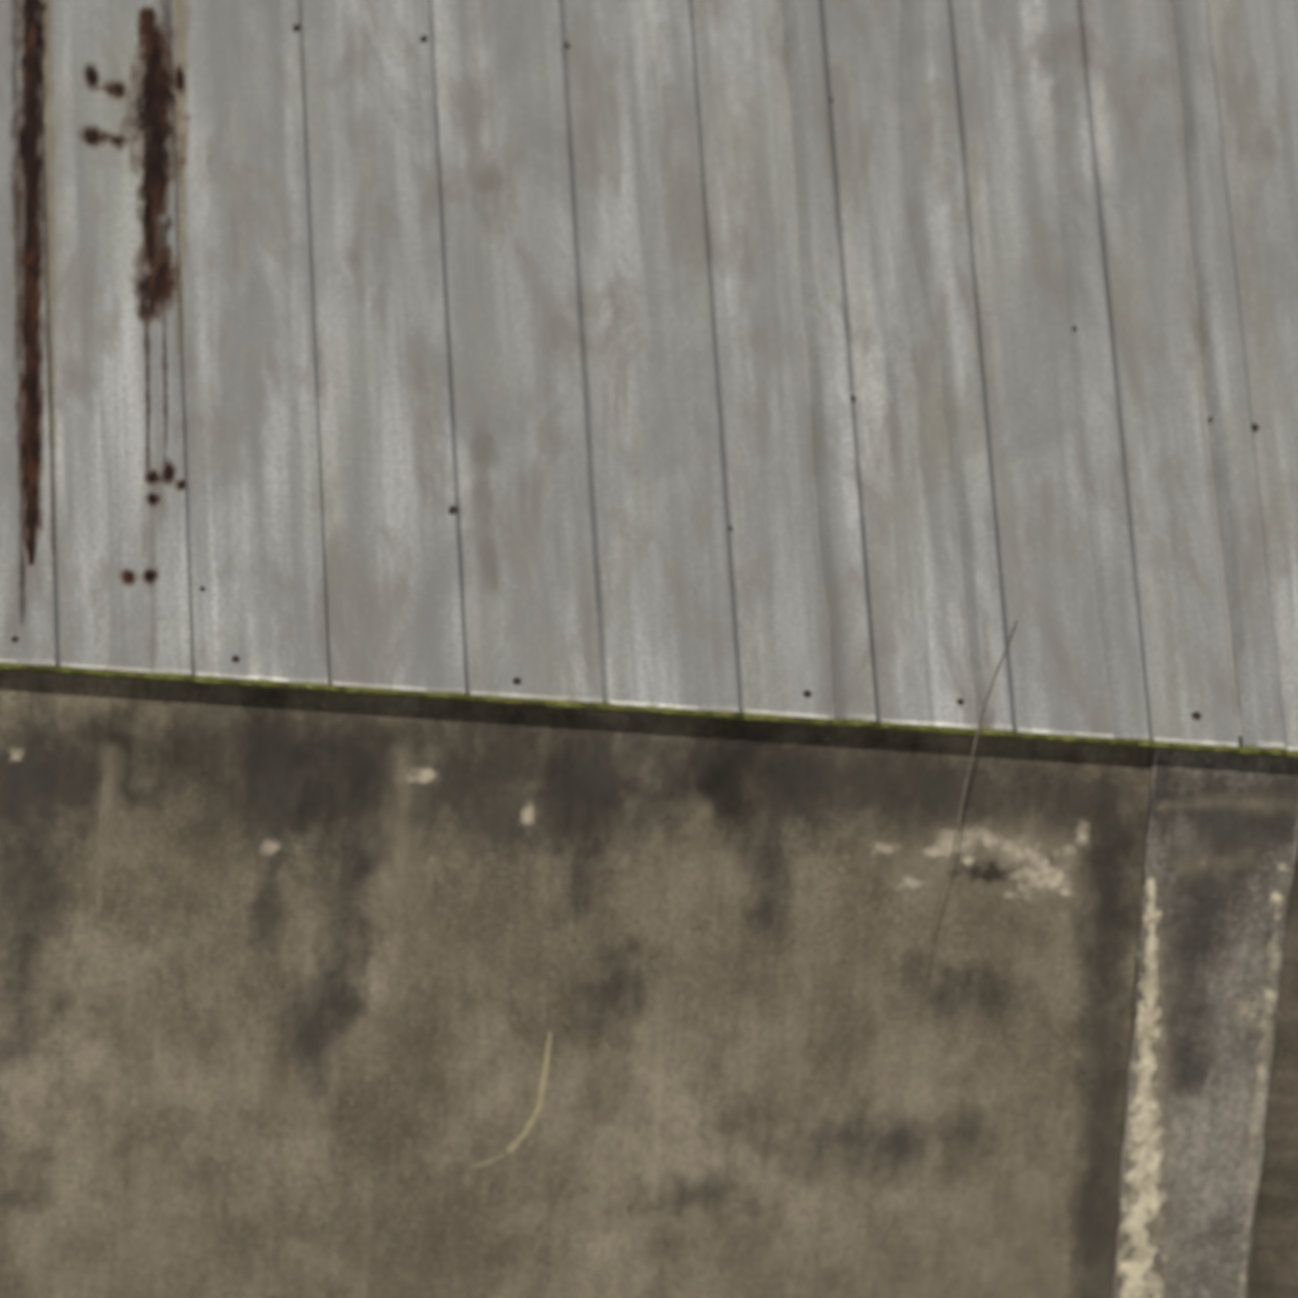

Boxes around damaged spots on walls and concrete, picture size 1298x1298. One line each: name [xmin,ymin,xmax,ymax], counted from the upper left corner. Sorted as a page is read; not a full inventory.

rust [13,0,46,588]
rust [84,7,186,505]
rust [122,570,157,584]
water stain [0,723,129,911]
water stain [168,705,1120,866]
water stain [1153,764,1297,961]
water stain [1078,844,1128,1271]